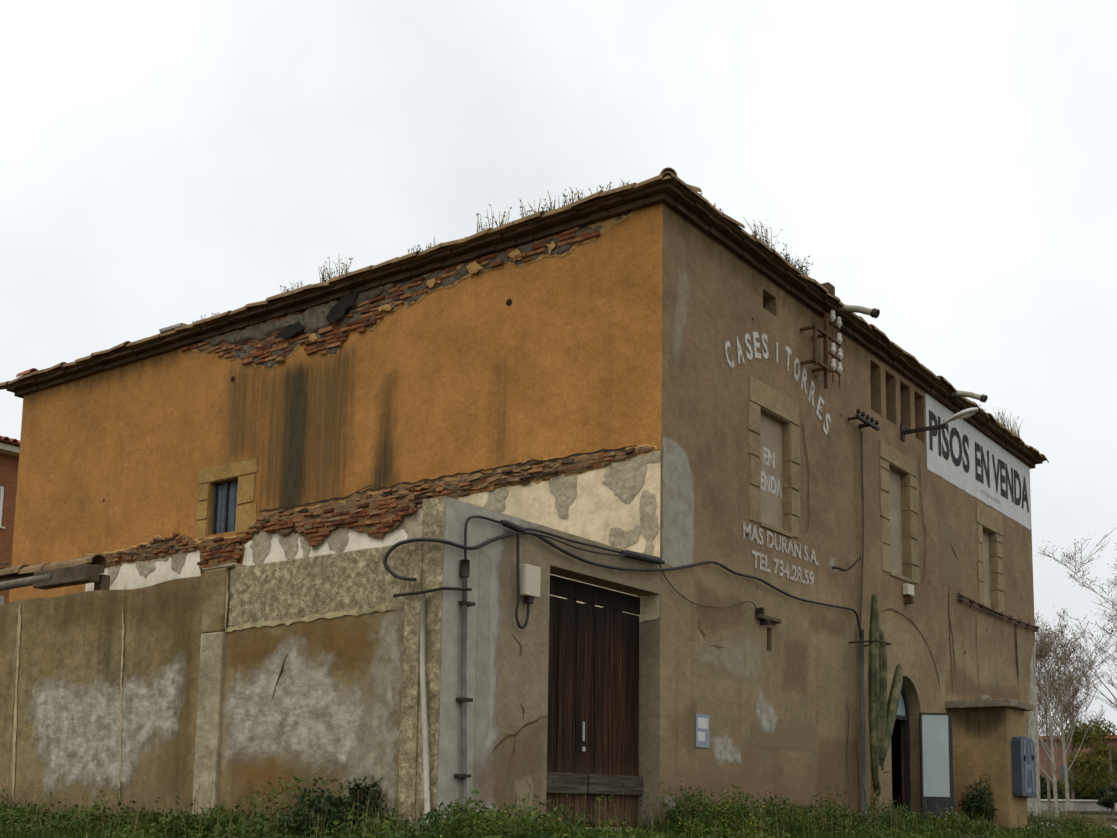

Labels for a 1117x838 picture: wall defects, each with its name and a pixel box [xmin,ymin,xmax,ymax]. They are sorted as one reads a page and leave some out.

spalling [179,211,638,370]
leakage [267,365,339,511]
peeling [82,444,661,591]
leakage [374,428,391,489]
peeling [550,574,660,622]
crack [492,704,547,798]